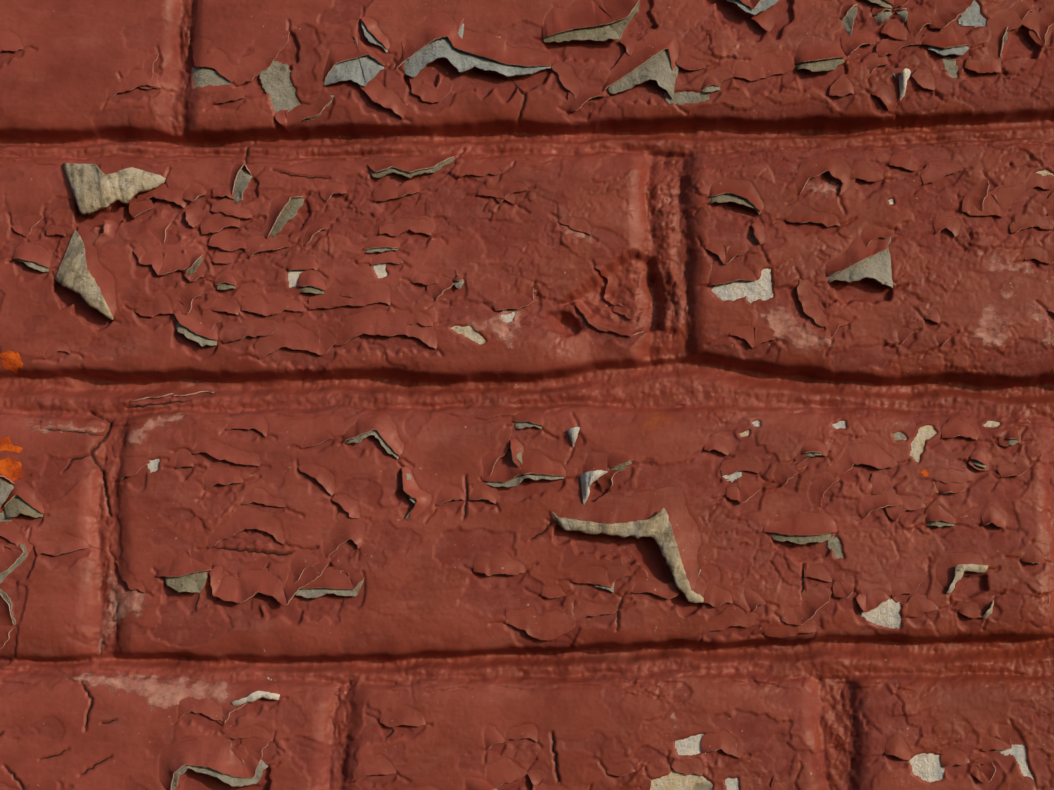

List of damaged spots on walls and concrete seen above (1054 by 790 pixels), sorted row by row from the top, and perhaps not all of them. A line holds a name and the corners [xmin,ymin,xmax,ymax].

peeling [191,0,1054,132]
peeling [12,143,433,359]
peeling [451,286,534,349]
peeling [705,175,774,303]
peeling [797,279,848,336]
peeling [824,225,894,289]
peeling [786,151,963,227]
peeling [0,473,89,649]
peeling [481,410,1031,640]
peeling [159,675,280,790]
peeling [601,713,794,790]
peeling [885,724,1037,790]